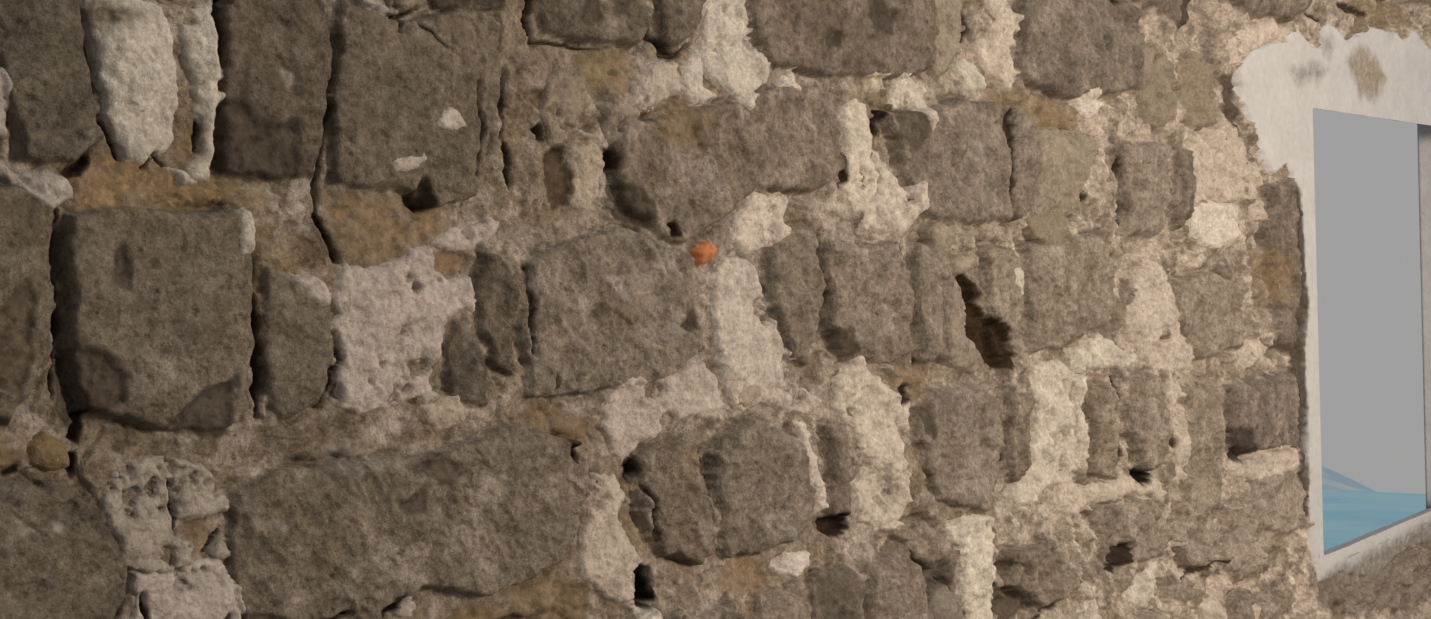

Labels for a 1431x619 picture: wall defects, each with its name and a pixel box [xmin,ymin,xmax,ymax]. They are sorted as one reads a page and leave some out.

crack [322,101,331,125]
crack [310,160,334,263]
crack [325,347,340,388]
crack [139,595,147,619]